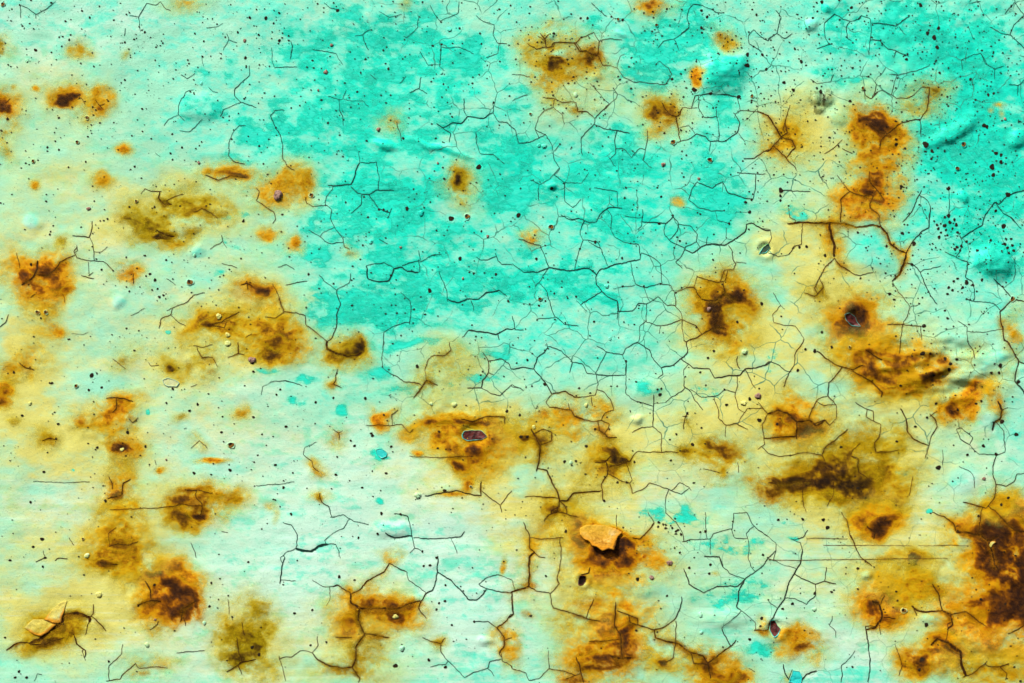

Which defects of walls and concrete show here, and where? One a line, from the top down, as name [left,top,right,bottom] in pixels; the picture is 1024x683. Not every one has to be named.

crack [164,23,343,223]
crack [16,228,134,302]
crack [269,1,1024,683]
corrosion [815,286,1003,426]
peeling [25,601,67,636]
crack [6,604,205,681]
corrosion [75,392,207,636]
peeling [462,430,487,441]
corrosion [370,399,633,497]
peeling [580,525,622,551]
corrosion [522,493,755,683]
corrosion [748,389,1024,683]